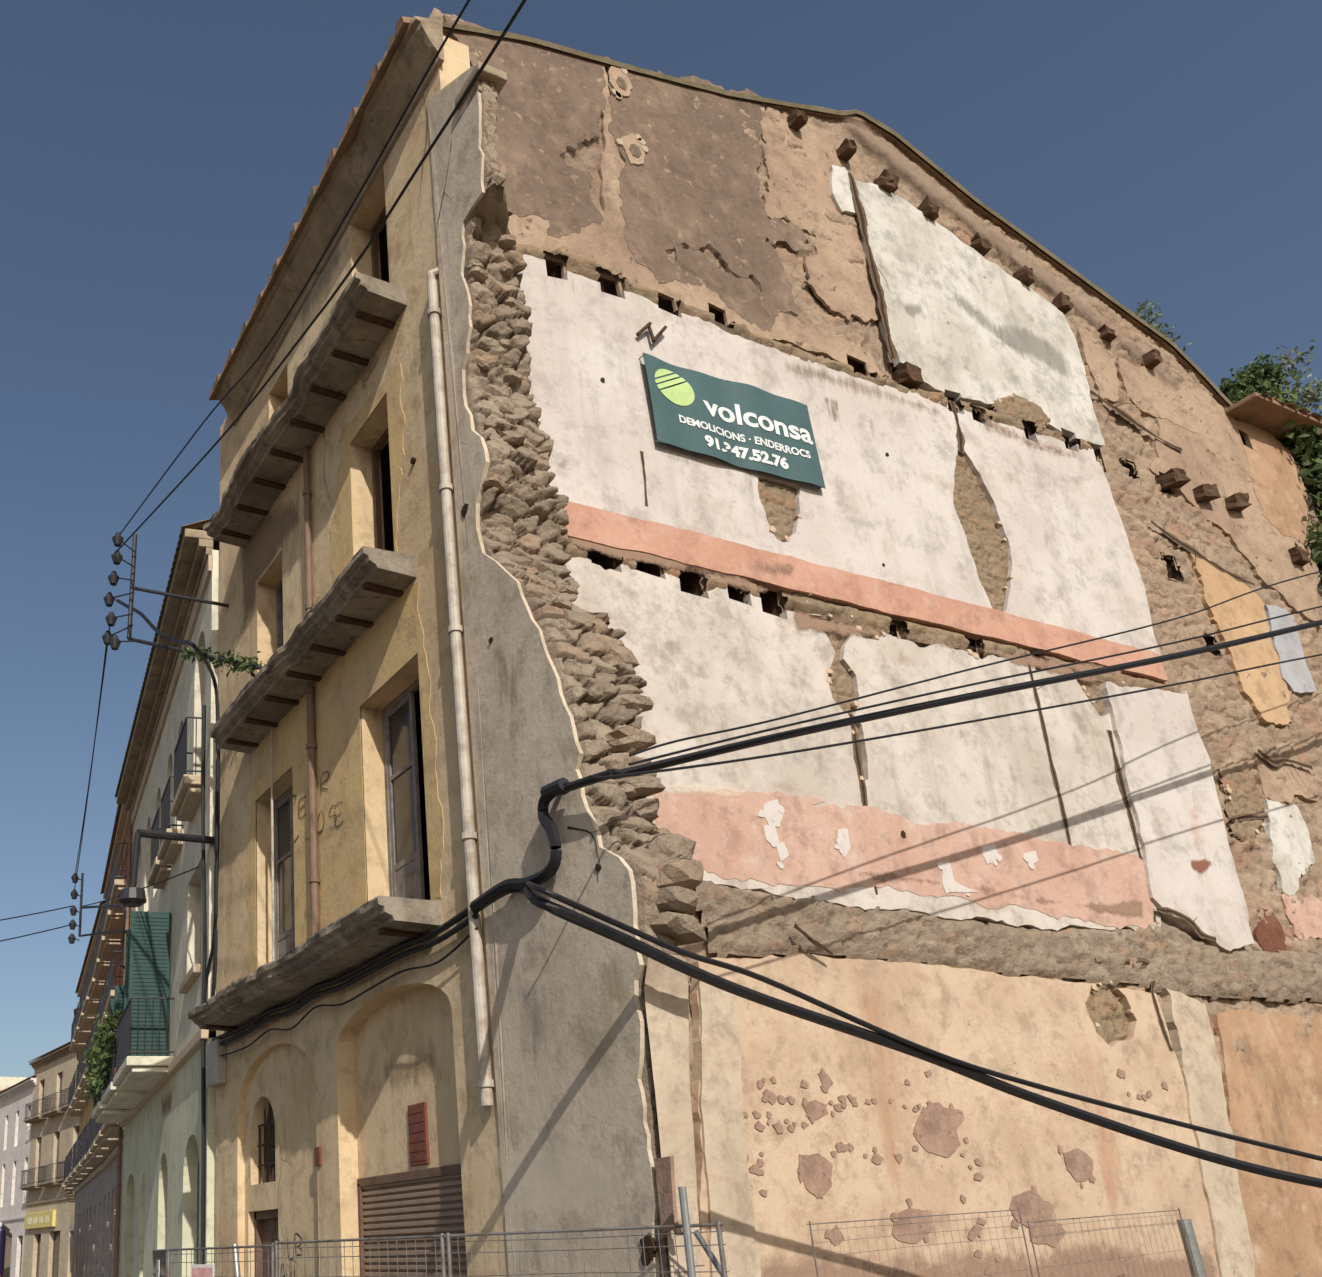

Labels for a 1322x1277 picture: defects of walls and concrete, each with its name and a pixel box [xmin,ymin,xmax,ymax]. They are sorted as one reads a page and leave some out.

peeling [608,65,633,101]
peeling [615,133,649,166]
crack [848,172,896,359]
spalling [953,454,1013,611]
peeling [758,799,789,869]
spalling [1219,767,1266,848]
peeling [936,862,977,896]
spalling [1082,980,1134,1044]
peeling [743,1068,984,1199]
peeling [1057,1145,1096,1189]
peeling [1009,1185,1067,1247]
water stain [763,1247,1215,1277]